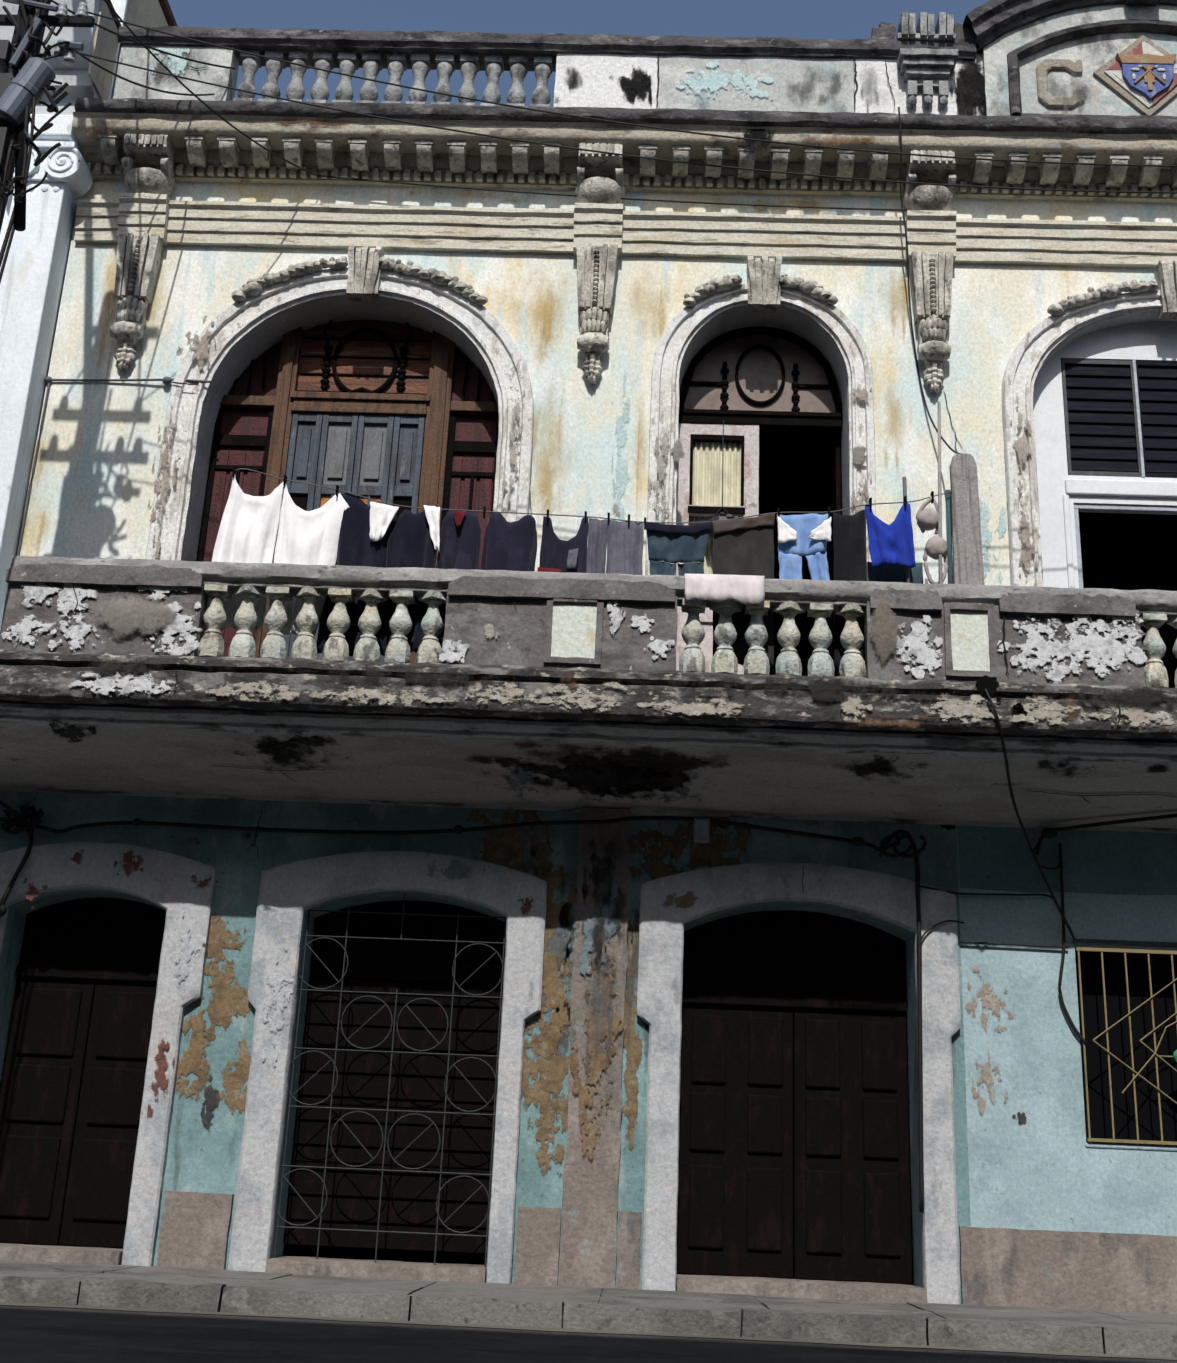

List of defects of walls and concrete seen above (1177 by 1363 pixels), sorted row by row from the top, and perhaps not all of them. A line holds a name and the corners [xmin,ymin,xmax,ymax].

leakage [619,68,652,104]
peeling [1,583,100,652]
peeling [136,586,201,655]
peeling [895,615,945,680]
peeling [997,613,1148,684]
spalling [69,672,178,695]
spalling [921,675,1175,727]
leakage [234,726,334,772]
leakage [469,748,729,800]
peeling [428,771,751,1177]
peeling [147,914,294,1131]
peeling [967,1051,1027,1124]